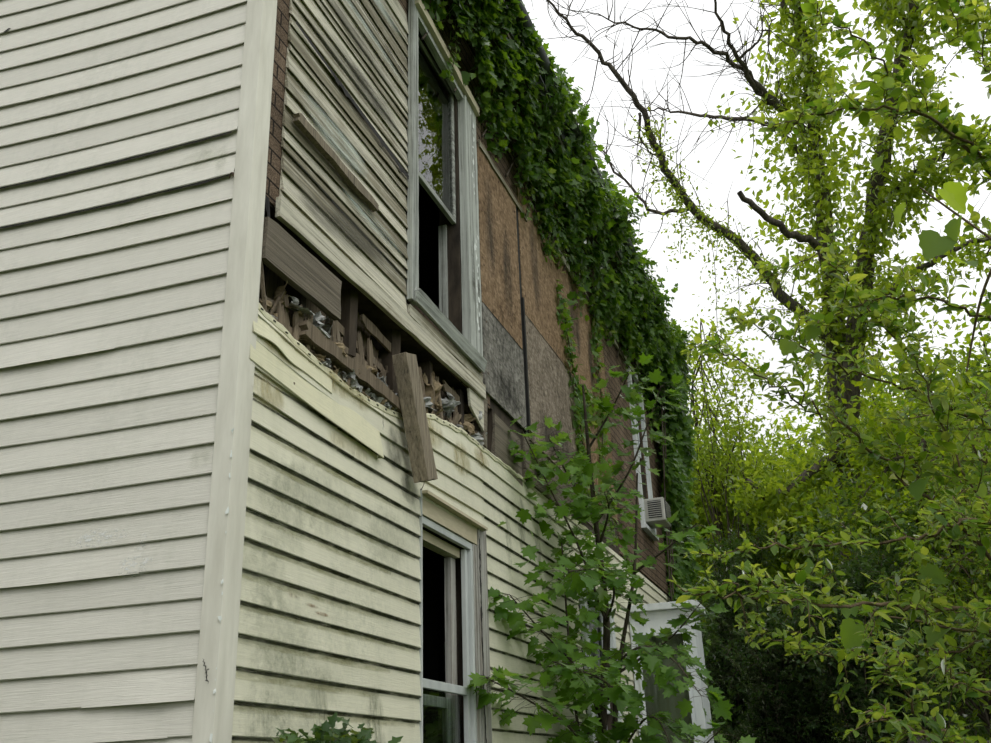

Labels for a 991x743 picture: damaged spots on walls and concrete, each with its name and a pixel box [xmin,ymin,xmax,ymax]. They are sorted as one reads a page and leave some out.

spalling [259,259,402,414]
spalling [417,361,487,446]